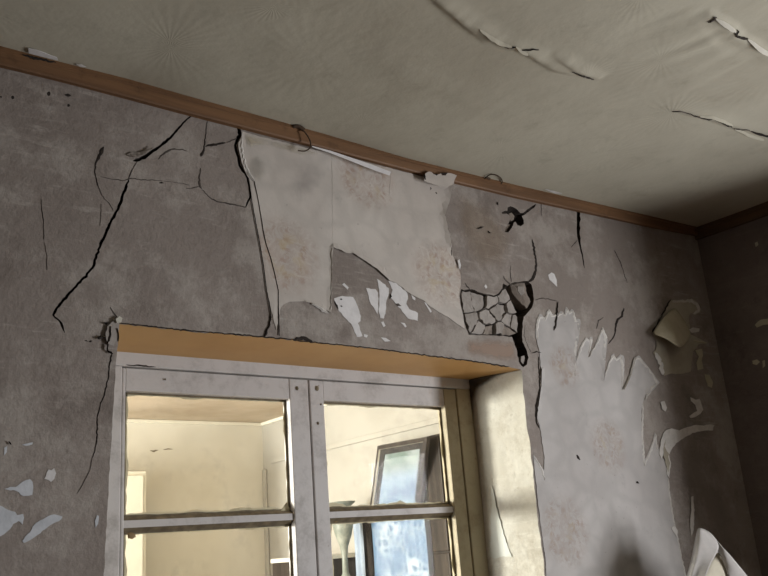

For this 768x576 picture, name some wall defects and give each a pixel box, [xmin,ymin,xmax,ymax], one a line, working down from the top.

crack [52,116,509,367]
peeling [334,283,368,338]
peeling [366,279,432,327]
peeling [652,299,707,376]
crack [78,354,112,492]
peeling [6,479,33,496]
peeling [0,506,24,536]
peeling [23,514,62,543]